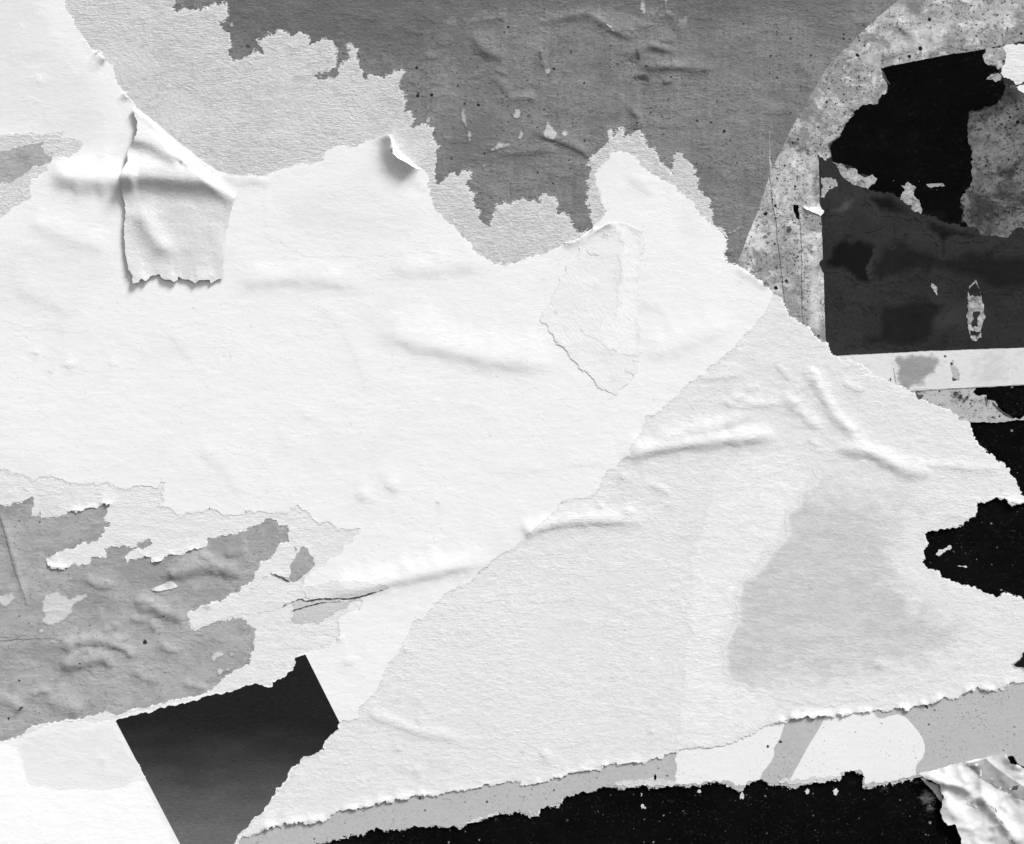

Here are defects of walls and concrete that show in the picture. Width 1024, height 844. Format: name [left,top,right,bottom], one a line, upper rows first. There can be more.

peeling [960,44,1024,238]
peeling [803,162,877,216]
peeling [900,182,944,214]
peeling [966,280,986,341]
peeling [892,351,960,391]
peeling [973,385,1024,418]
peeling [0,592,16,607]
peeling [38,591,93,633]
peeling [151,581,178,591]
peeling [191,546,388,629]
crack [273,574,388,611]